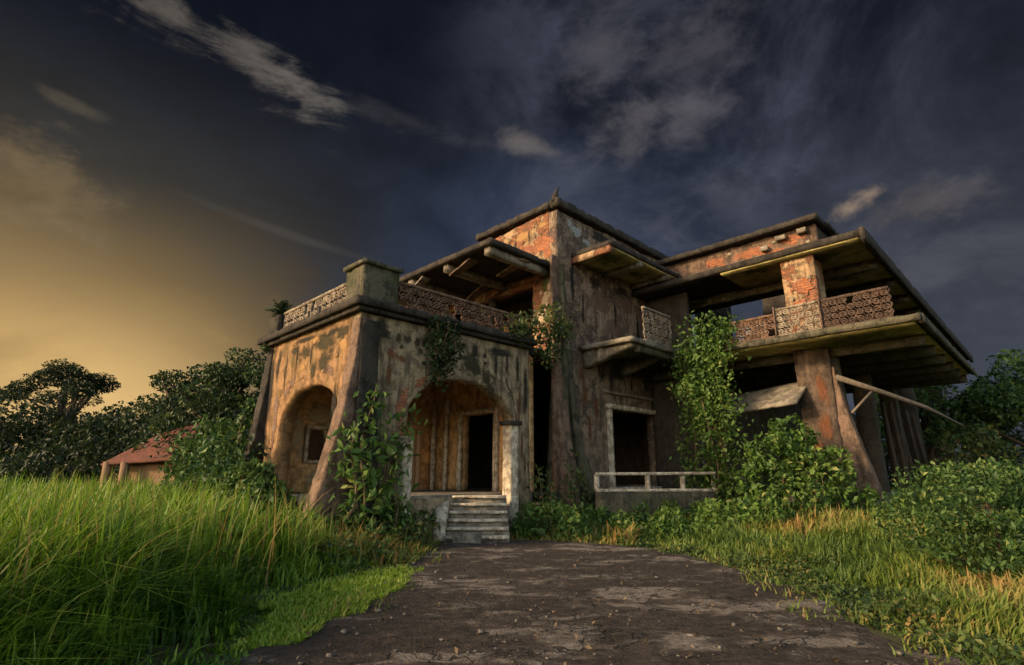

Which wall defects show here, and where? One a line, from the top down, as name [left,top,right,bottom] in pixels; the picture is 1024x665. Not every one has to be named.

spalling [508,222,554,259]
spalling [706,234,810,268]
leakage [378,317,429,353]
leakage [265,326,348,427]
leakage [472,345,528,416]